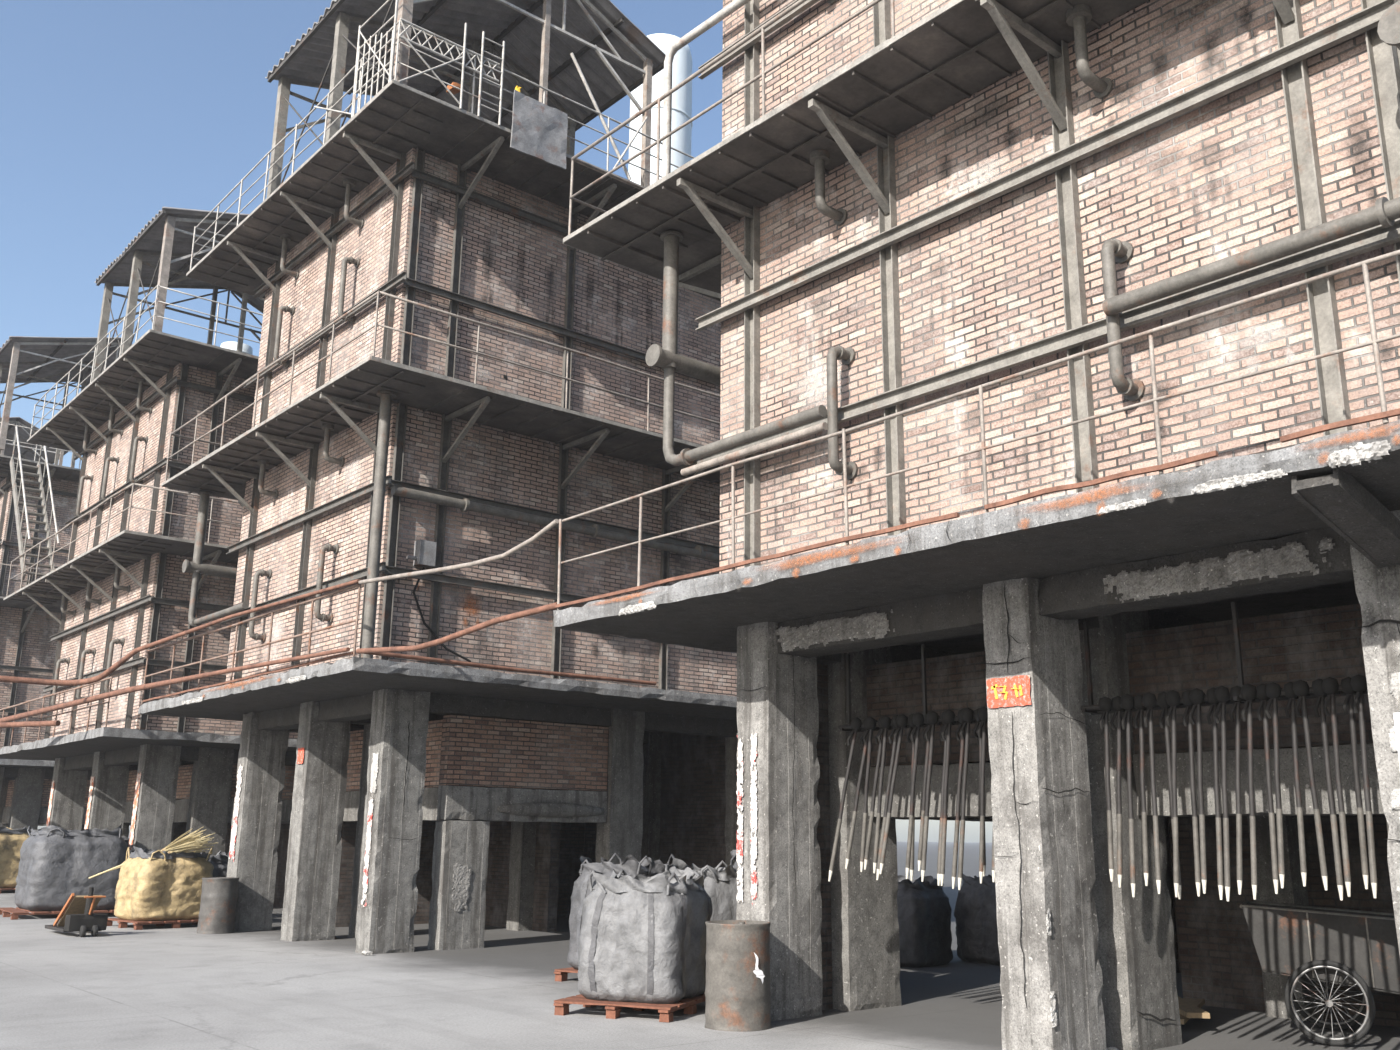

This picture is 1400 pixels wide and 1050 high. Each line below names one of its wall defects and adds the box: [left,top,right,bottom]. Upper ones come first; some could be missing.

spalling [1326,440,1391,468]
corrosion [1320,425,1400,462]
corrosion [1044,487,1122,510]
corrosion [779,546,867,576]
spalling [1103,537,1335,603]
spalling [775,609,895,652]
crack [1358,619,1400,657]
peeling [1389,672,1400,698]
peeling [1390,788,1400,809]